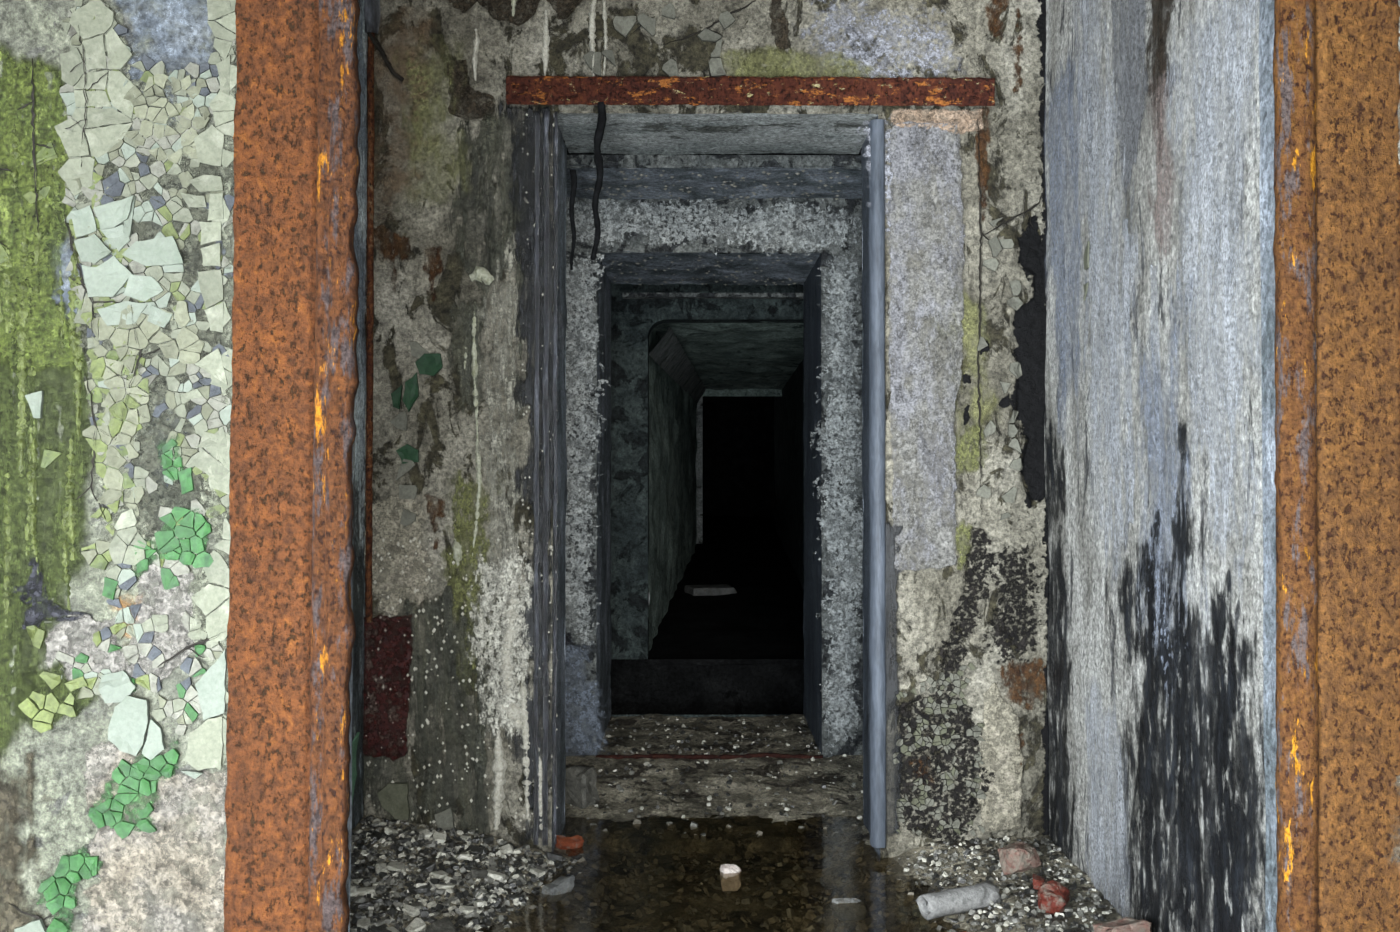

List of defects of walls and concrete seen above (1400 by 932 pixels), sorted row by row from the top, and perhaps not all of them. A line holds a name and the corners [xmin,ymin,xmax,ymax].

water stain [52,239,78,318]
spalling [7,0,237,932]
water stain [1035,0,1100,862]
water stain [1123,219,1131,356]
water stain [1111,0,1175,254]
water stain [1105,314,1266,932]